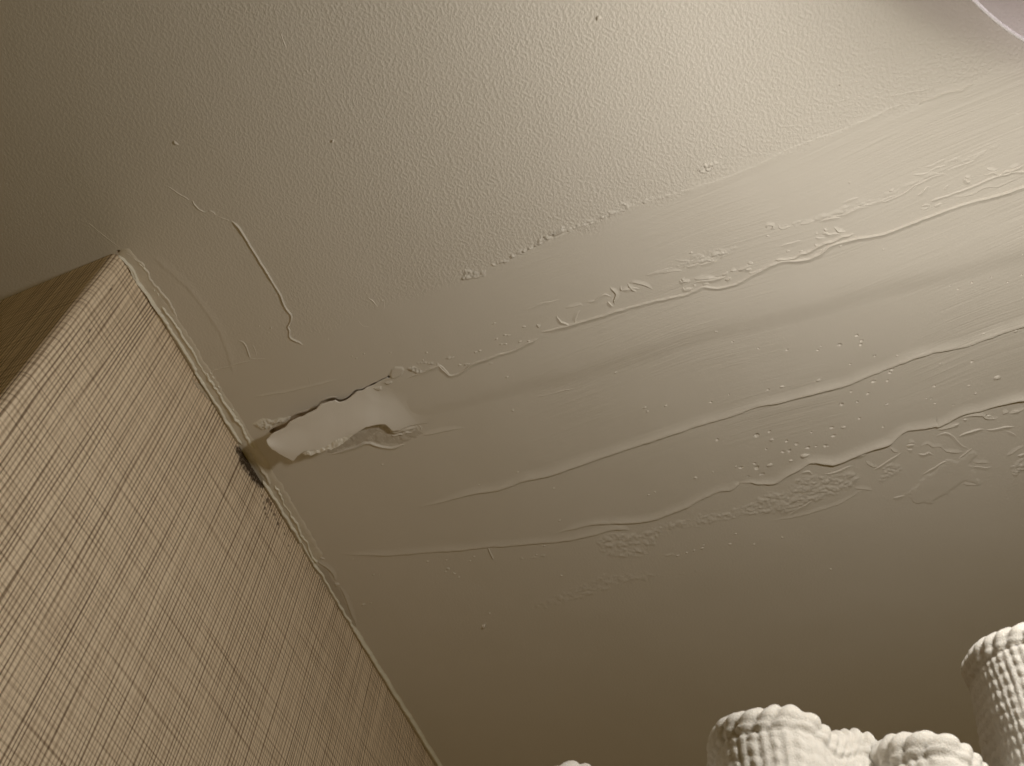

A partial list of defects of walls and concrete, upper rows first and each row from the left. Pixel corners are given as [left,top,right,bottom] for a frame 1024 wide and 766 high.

crack [167,186,303,345]
peeling [252,366,466,461]
leakage [236,446,289,546]